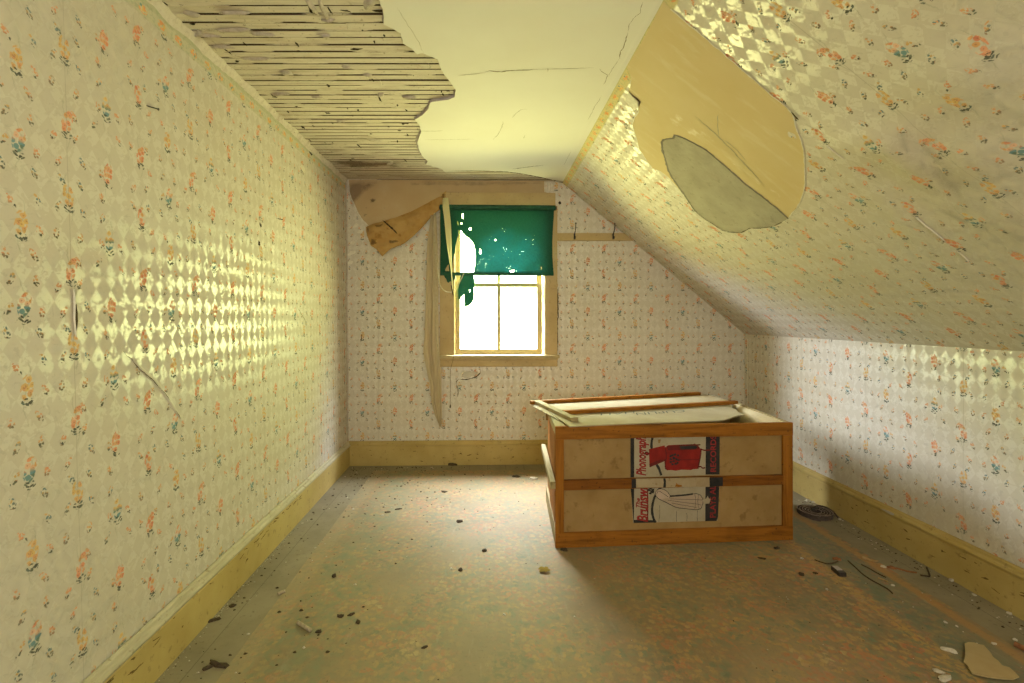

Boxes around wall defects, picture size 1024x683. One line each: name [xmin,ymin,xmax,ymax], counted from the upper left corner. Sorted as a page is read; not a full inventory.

flaking render [147,0,561,296]
crack [566,3,643,119]
flaking render [625,2,806,233]
crack [123,351,181,419]